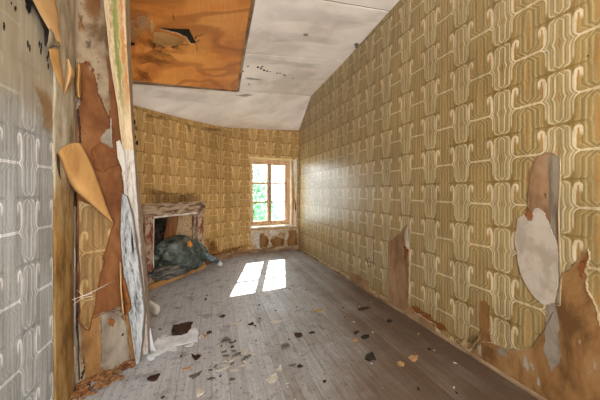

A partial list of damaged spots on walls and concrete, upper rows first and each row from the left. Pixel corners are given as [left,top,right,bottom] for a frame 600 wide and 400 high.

spalling [162,28,195,43]
peeling [116,140,126,185]
spalling [249,158,299,249]
peeling [388,224,437,331]
peeling [458,151,600,400]
spalling [82,303,135,378]